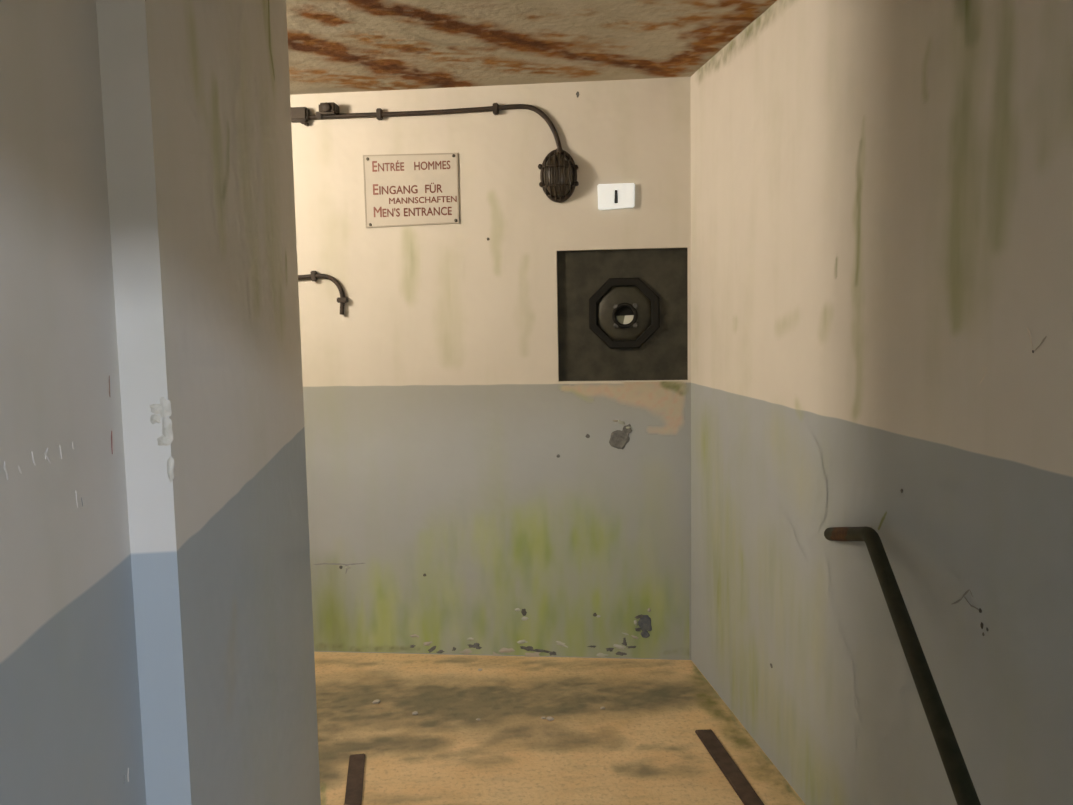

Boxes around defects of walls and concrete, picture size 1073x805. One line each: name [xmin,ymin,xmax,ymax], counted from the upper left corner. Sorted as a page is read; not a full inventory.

rust [286,0,777,92]
leakage [853,134,864,291]
leakage [934,0,1073,348]
peeling [555,381,689,449]
leakage [494,450,689,619]
peeling [410,634,568,657]
leakage [310,524,714,805]
spalling [588,608,652,658]